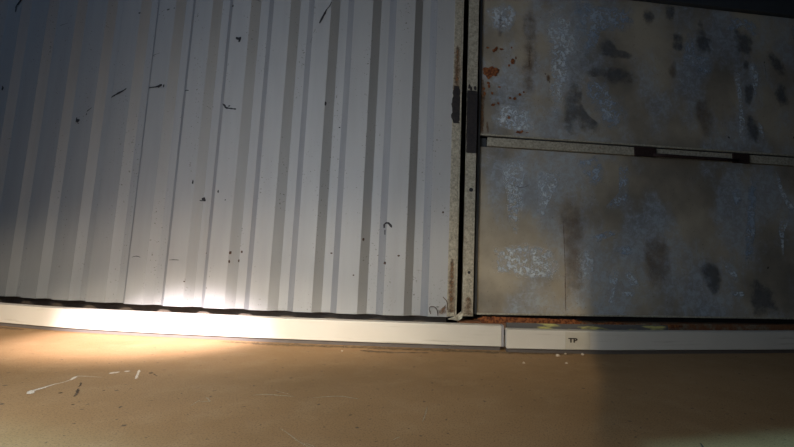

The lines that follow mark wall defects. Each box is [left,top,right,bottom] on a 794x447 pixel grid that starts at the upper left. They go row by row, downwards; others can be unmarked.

corrosion [483,66,501,106]
corrosion [466,297,582,324]